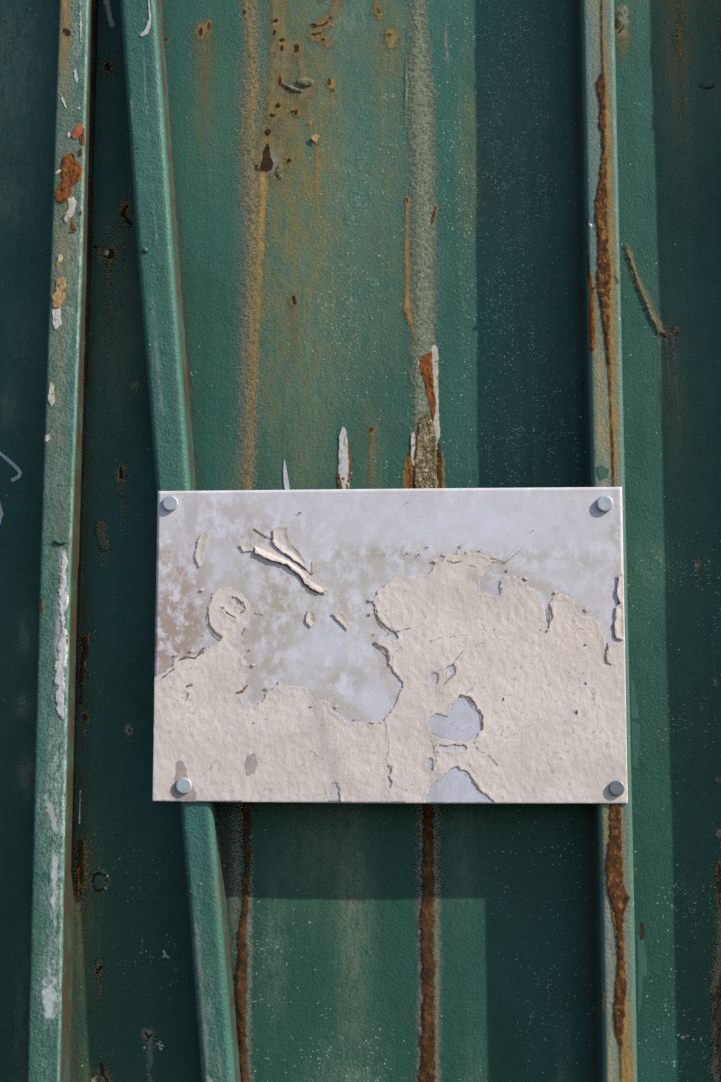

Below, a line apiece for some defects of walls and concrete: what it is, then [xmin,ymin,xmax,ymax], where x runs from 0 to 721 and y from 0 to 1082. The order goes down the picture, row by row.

rust [55,149,82,232]
rust [240,0,341,490]
rust [586,0,629,487]
peeling [404,345,445,489]
peeling [239,520,328,595]
peeling [153,543,640,803]
rust [236,802,252,1082]
rust [418,803,439,1082]
rust [602,804,633,1082]
rust [711,861,721,1082]